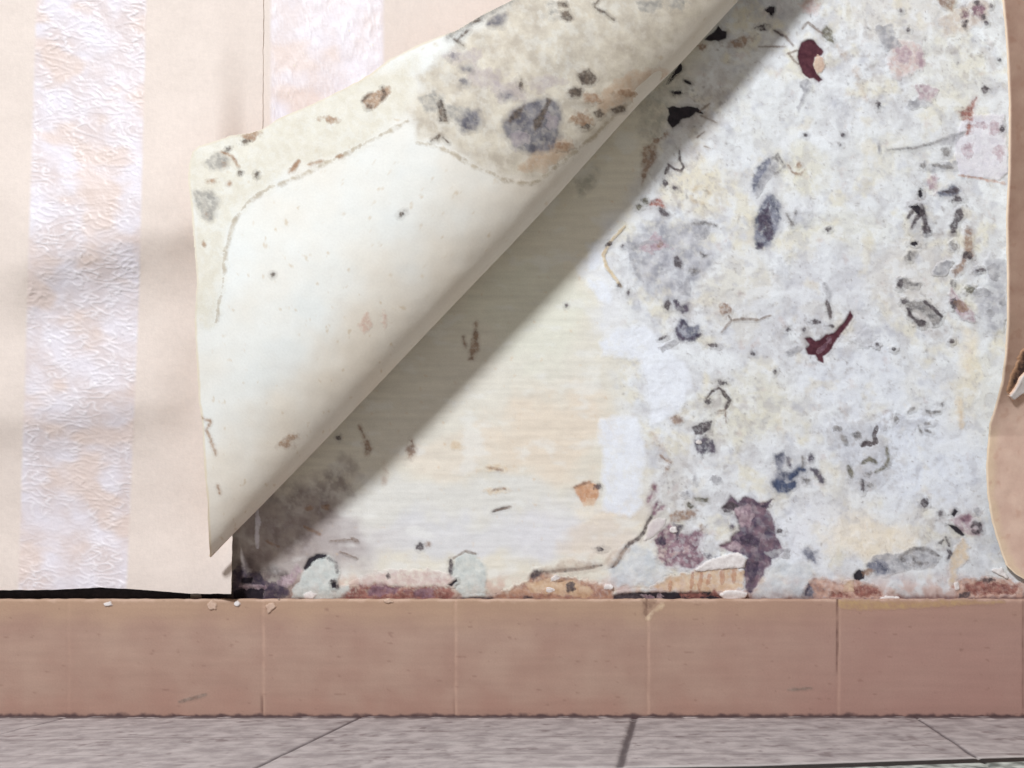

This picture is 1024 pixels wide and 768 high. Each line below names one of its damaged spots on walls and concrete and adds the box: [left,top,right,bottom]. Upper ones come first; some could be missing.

spalling [757,35,826,113]
peeling [954,93,1008,186]
spalling [631,194,673,219]
peeling [601,225,633,301]
spalling [802,308,856,366]
damp [0,431,366,599]
damp [445,576,461,589]
spalling [291,543,675,621]
damp [629,587,722,599]
damp [800,581,814,599]
spalling [716,492,900,599]
spalling [948,567,1024,599]